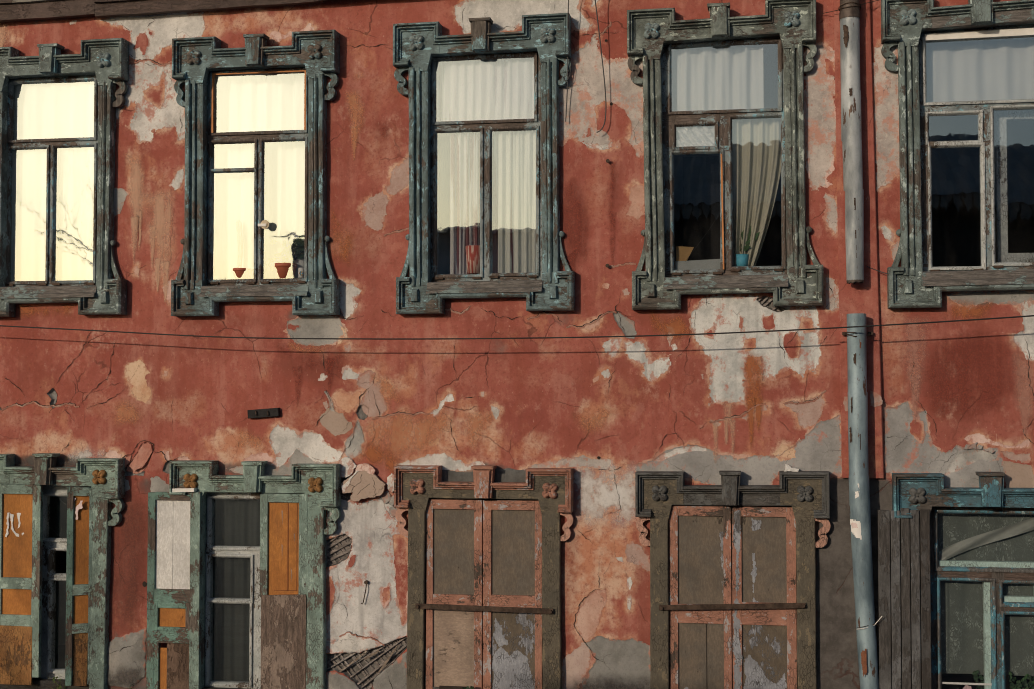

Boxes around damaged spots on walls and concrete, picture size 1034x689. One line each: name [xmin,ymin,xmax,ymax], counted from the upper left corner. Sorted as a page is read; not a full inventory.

flaking render [100,12,205,144]
flaking render [453,0,644,158]
crack [1,328,120,451]
crack [316,351,472,510]
flaking render [688,277,839,421]
flaking render [870,391,1034,488]
flaking render [947,290,1034,361]
flaking render [326,477,408,689]
flaking render [562,589,650,689]